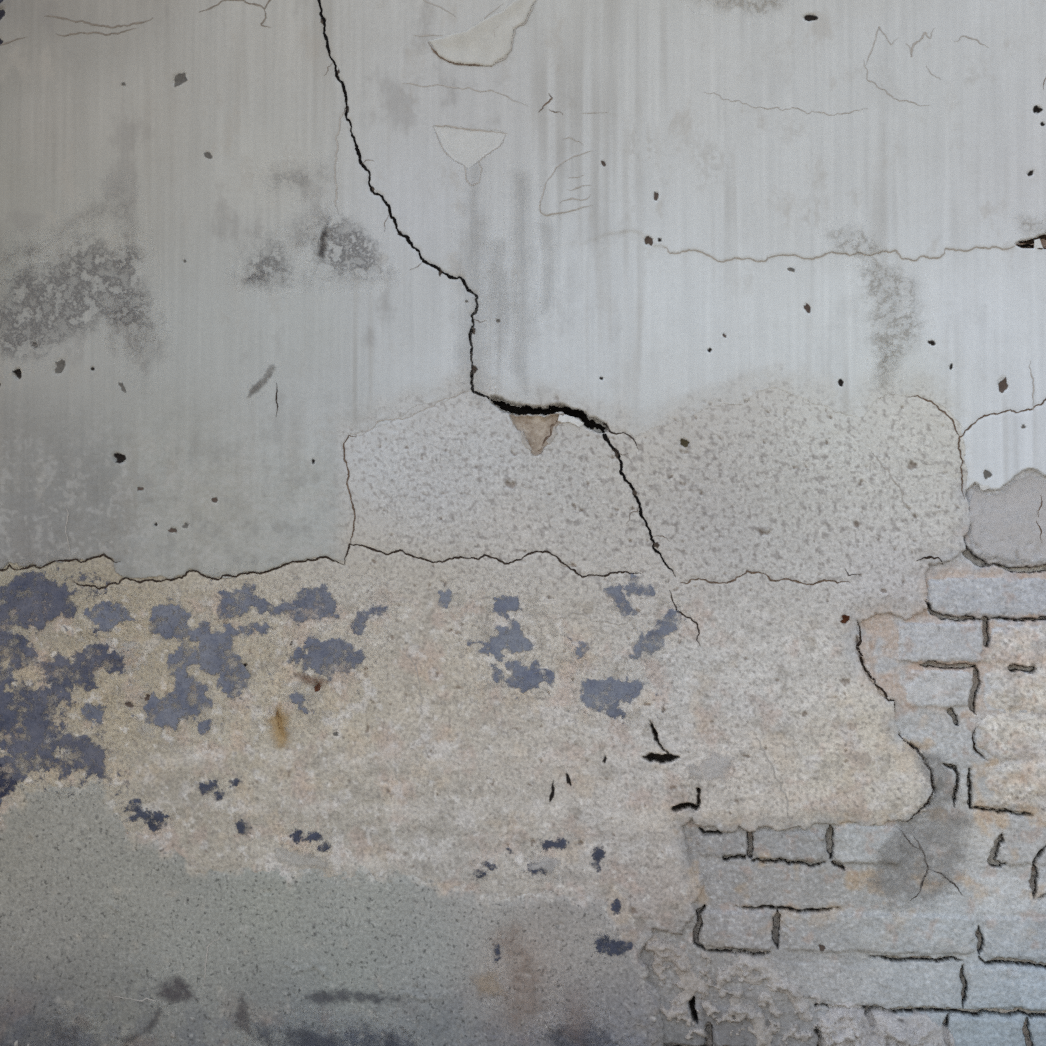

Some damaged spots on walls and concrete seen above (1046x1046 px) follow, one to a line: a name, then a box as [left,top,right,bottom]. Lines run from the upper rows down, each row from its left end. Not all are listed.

crack [664,246,1014,262]
crack [0,0,860,645]
flaking render [509,413,584,456]
crack [911,362,1046,499]
peeling [438,589,608,699]
peeling [0,566,391,831]
peeling [577,674,643,724]
flaking render [594,469,1046,1046]
peeling [289,830,331,852]
peeling [540,837,569,851]
leakage [161,979,191,1001]
leakage [310,991,393,1003]